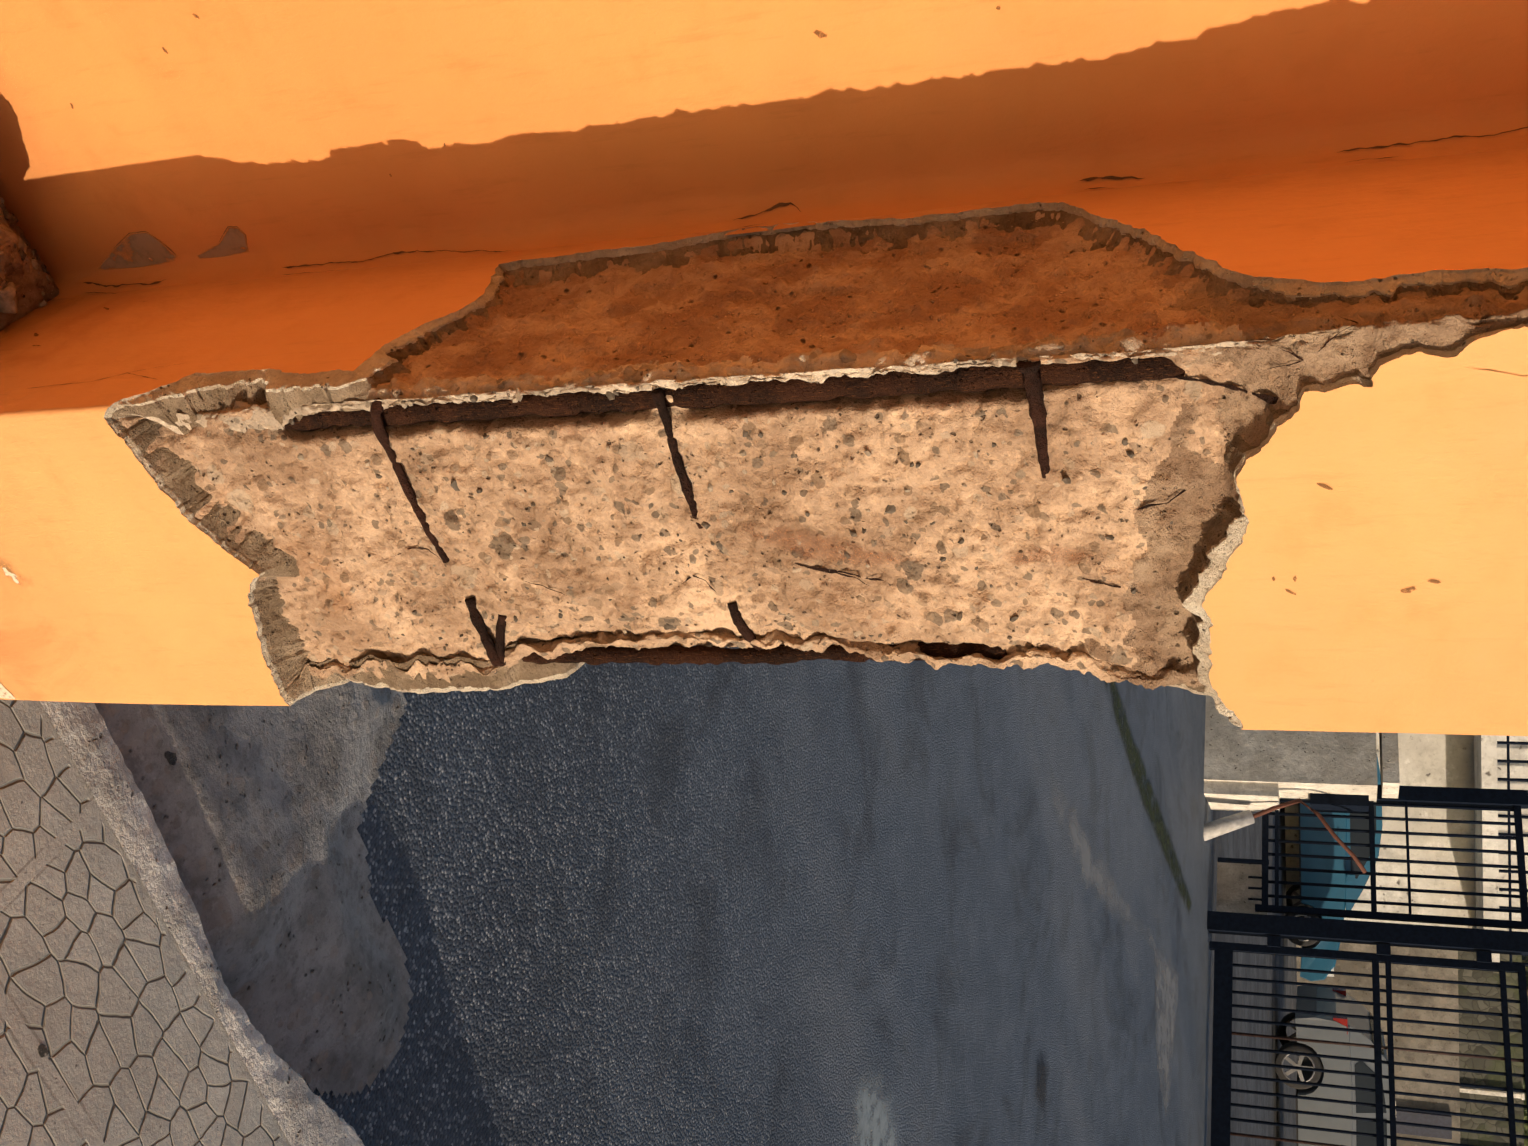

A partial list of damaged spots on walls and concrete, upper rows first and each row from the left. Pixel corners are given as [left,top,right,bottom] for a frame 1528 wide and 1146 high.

crack [1337,127,1528,163]
spalling [101,202,1528,729]
flaking render [0,684,15,699]